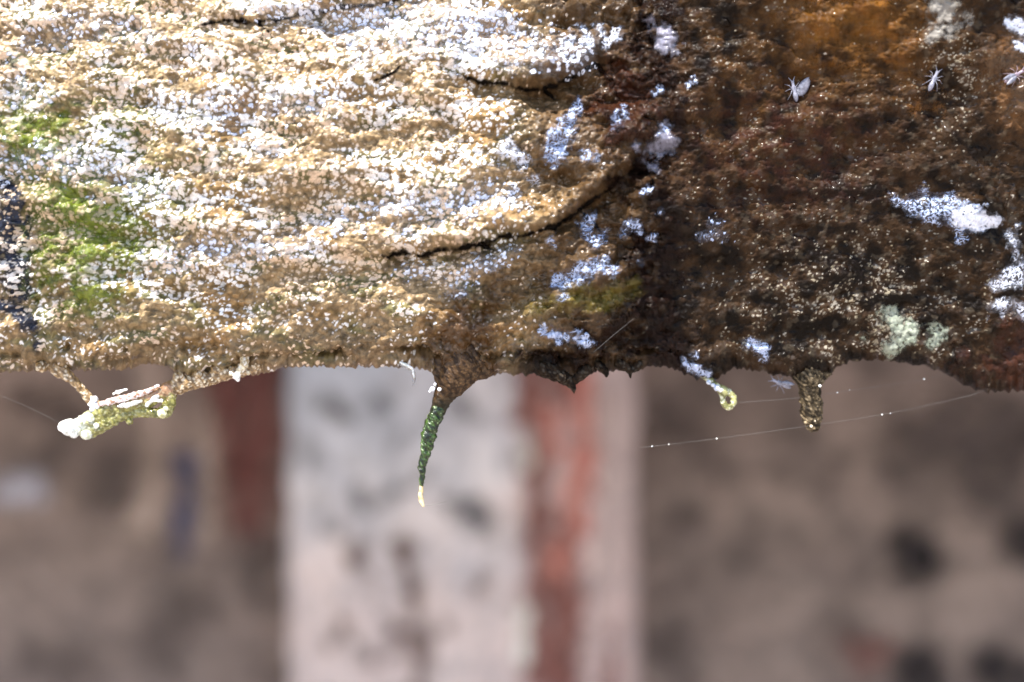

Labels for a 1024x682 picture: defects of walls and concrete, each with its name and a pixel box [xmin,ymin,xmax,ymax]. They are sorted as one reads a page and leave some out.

leakage [1004,17,1024,52]
crack [457,59,619,100]
crack [381,153,655,259]
leakage [0,130,182,349]
leakage [893,189,1024,316]
leakage [747,337,771,361]
leakage [97,384,163,408]